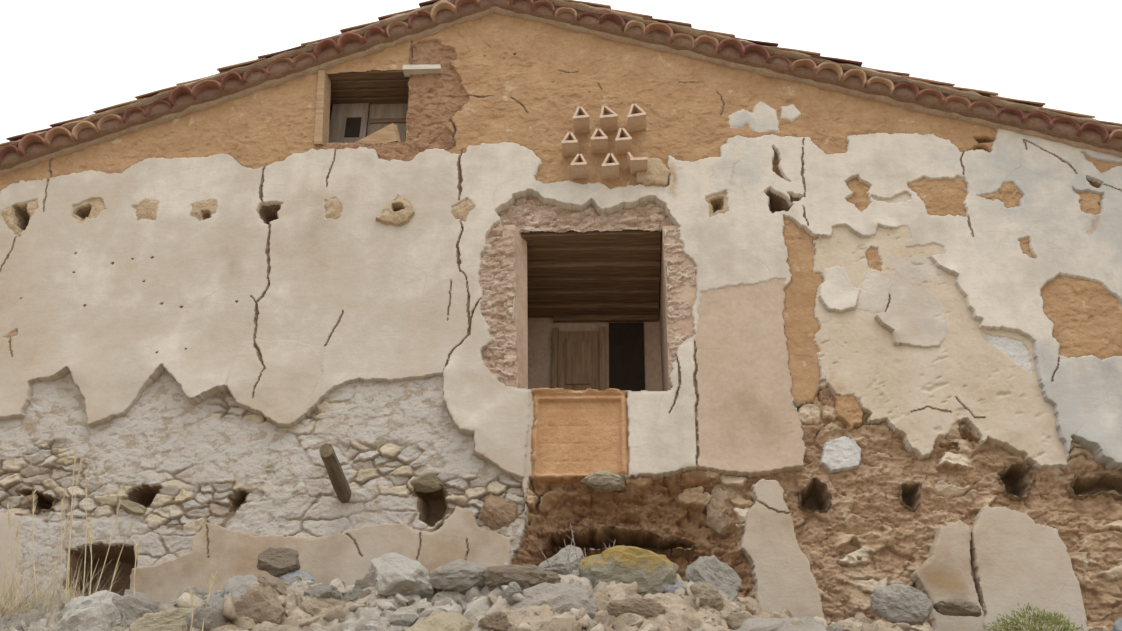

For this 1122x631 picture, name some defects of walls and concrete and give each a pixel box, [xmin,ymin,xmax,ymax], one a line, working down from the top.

crack [442,94,529,373]
flaking render [846,176,1023,217]
crack [966,216,974,237]
flaking render [1073,154,1122,215]
crack [250,163,271,399]
crack [324,310,344,347]
flaking render [0,190,1122,611]
crack [668,341,700,471]
crack [415,533,423,561]
crack [463,540,471,561]